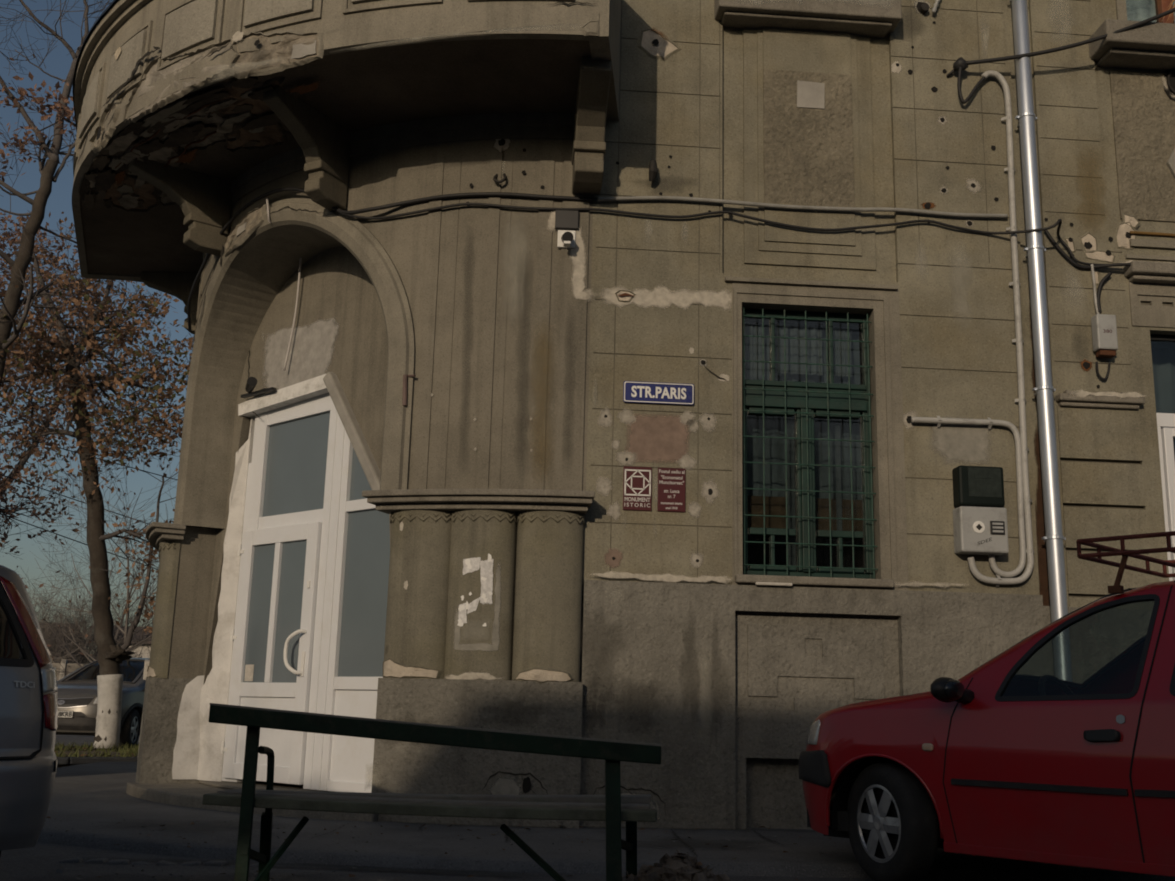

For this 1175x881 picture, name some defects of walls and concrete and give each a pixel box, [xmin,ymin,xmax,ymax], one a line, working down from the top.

flaking render [637,27,682,61]
flaking render [80,30,324,210]
flaking render [1065,213,1140,285]
flaking render [615,290,636,303]